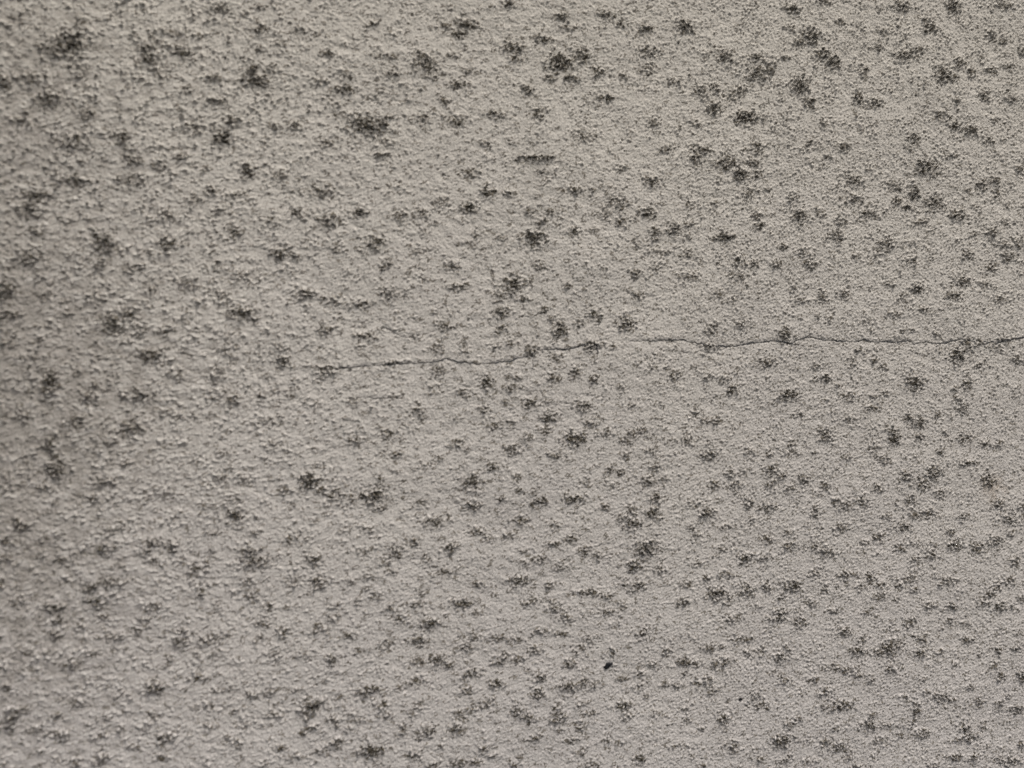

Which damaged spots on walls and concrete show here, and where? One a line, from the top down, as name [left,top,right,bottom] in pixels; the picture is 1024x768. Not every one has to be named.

crack [336,336,1024,370]